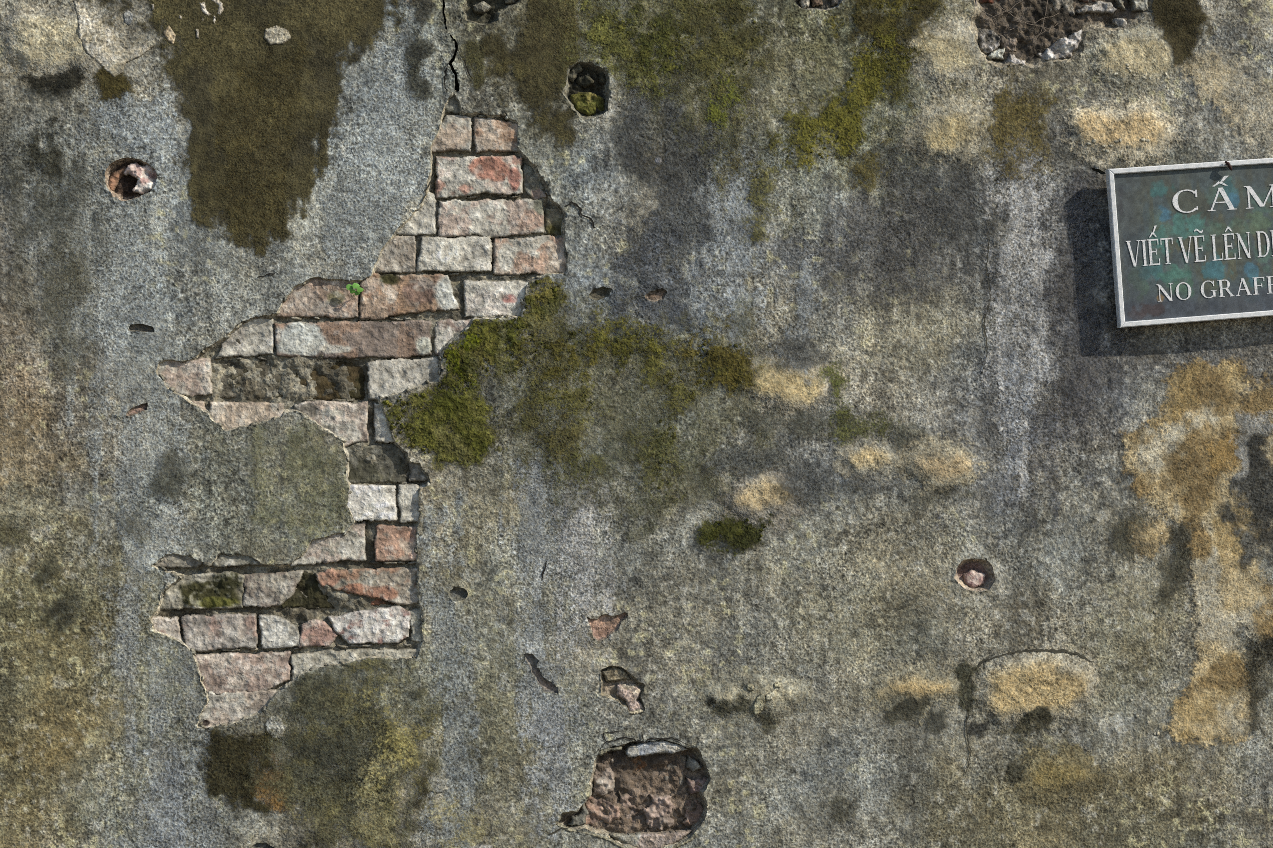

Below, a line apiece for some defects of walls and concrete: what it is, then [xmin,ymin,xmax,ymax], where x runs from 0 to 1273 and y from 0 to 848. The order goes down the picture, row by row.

crack [442,0,472,92]
spalling [462,0,521,25]
spalling [562,62,610,120]
spalling [970,0,1152,68]
damp [1152,0,1273,158]
spalling [105,157,158,201]
damp [96,0,442,279]
flaking render [150,90,568,739]
spalling [954,558,995,592]
damp [1113,358,1273,747]
spalling [556,739,711,848]